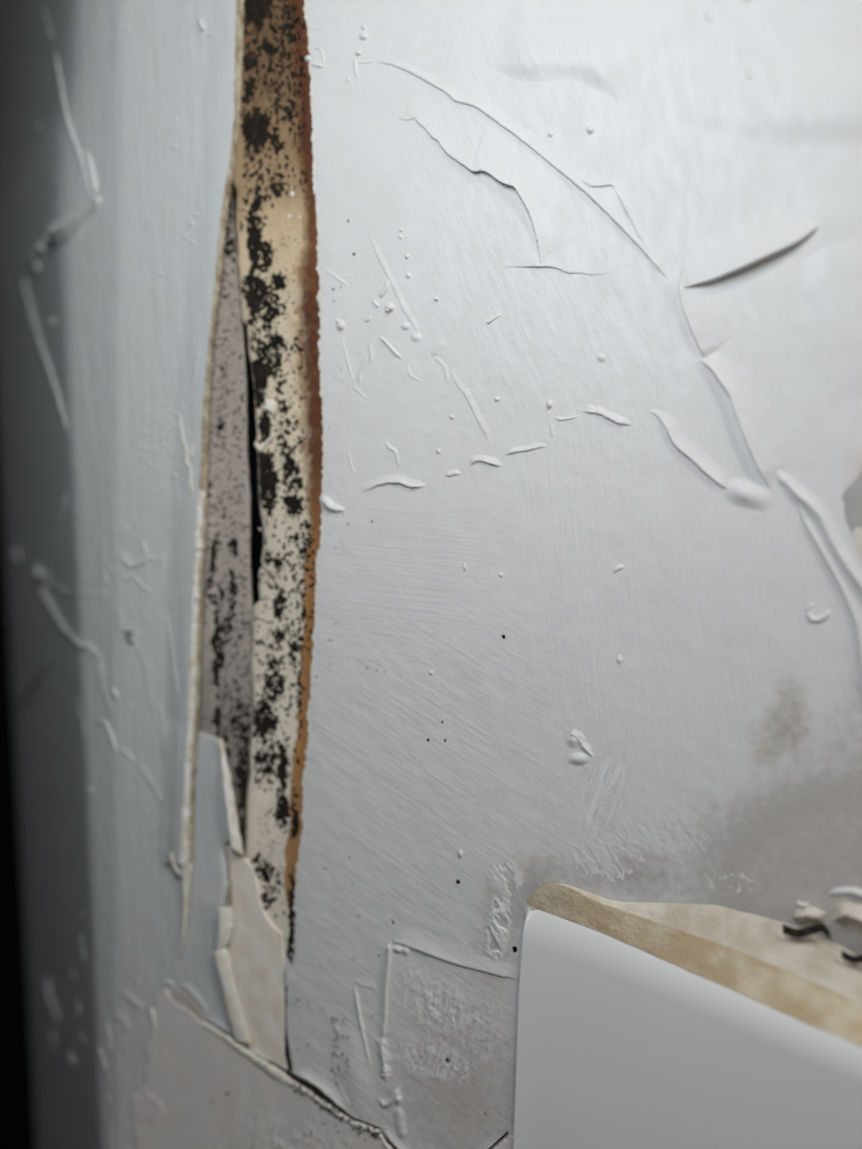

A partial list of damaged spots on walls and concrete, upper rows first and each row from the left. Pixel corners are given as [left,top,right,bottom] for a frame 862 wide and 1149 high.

crack [367,236,419,332]
damp [202,0,317,965]
crack [187,0,349,987]
spalling [842,406,862,559]
peeling [128,980,386,1149]
crack [204,1016,416,1149]
crack [478,1131,508,1149]
peeling [493,1135,514,1149]